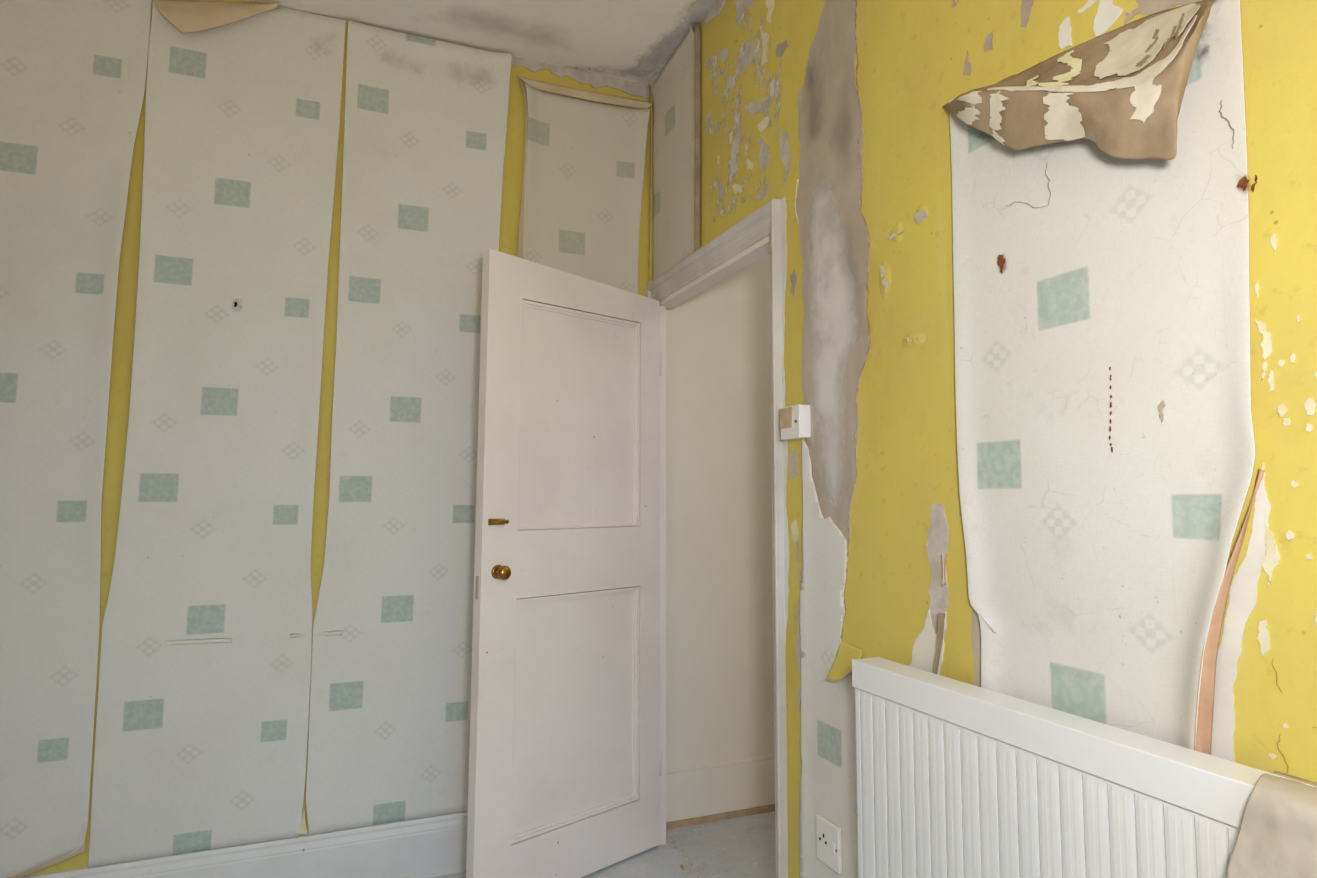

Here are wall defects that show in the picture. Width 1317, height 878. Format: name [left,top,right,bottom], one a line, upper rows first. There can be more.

peeling [1020,0,1034,28]
peeling [963,32,993,76]
flaking render [703,0,871,681]
peeling [1255,319,1317,432]
flaking render [926,503,949,640]
peeling [1261,508,1295,586]
peeling [1256,619,1270,657]